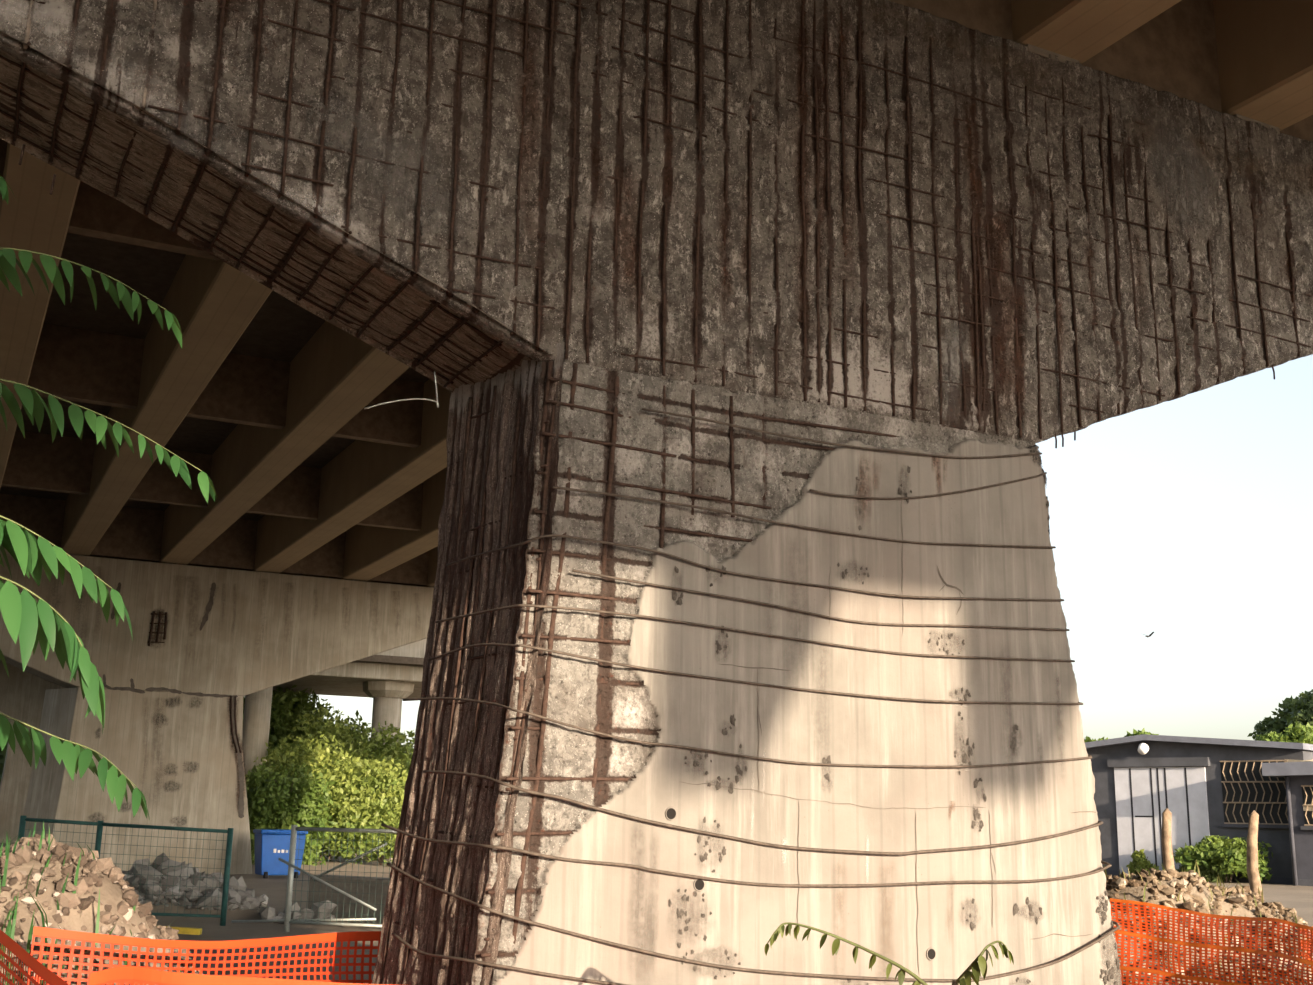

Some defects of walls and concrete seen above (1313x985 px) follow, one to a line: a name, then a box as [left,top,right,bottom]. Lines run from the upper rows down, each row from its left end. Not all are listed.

rust [797,19,864,277]
spalling [0,0,1313,707]
spalling [372,647,661,985]
peeling [669,889,741,980]
peeling [695,817,726,873]
peeling [685,744,748,794]